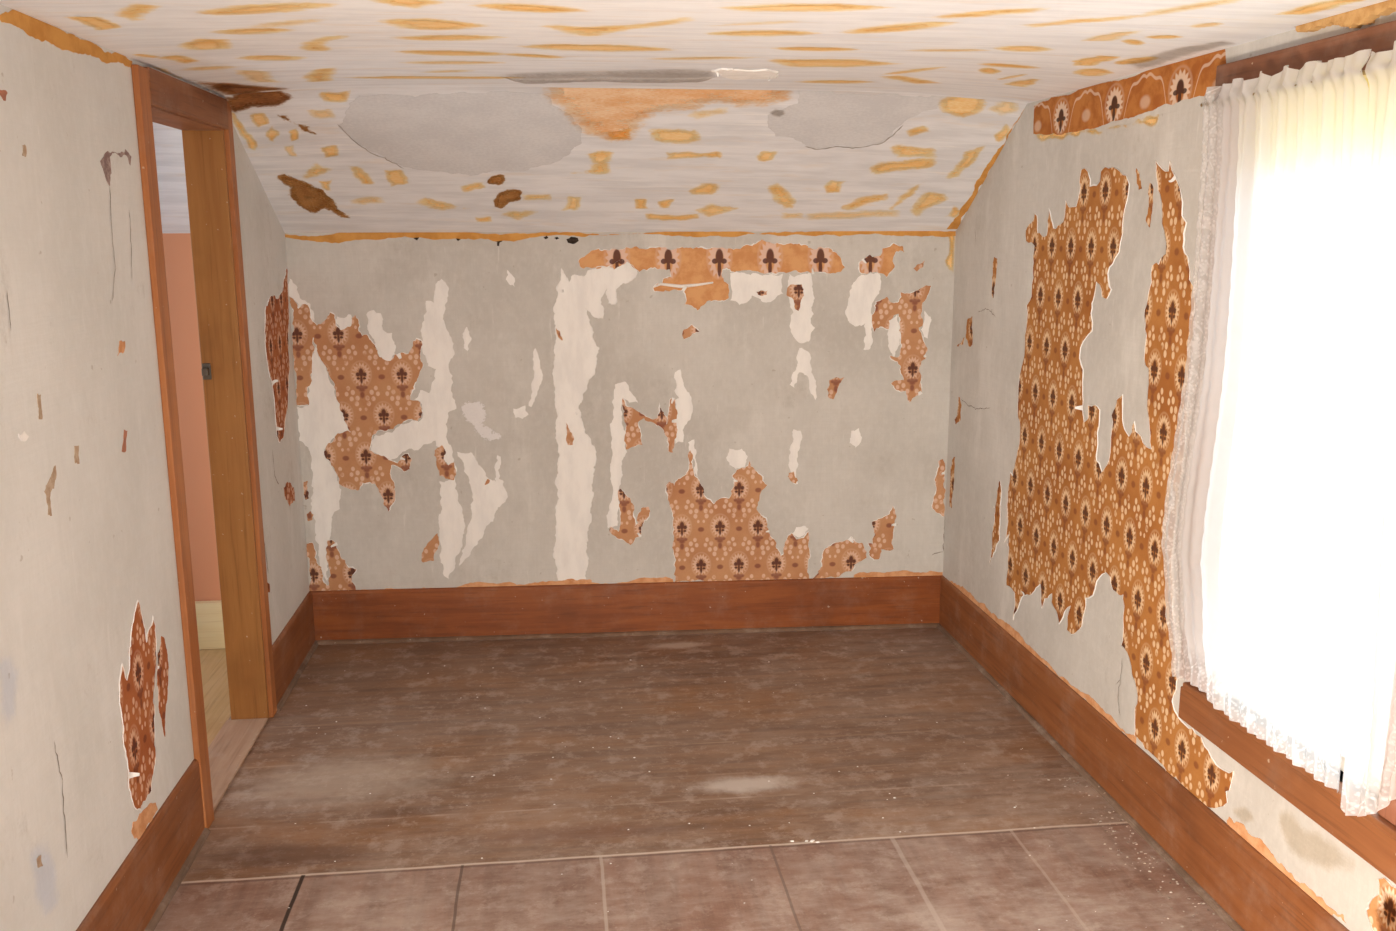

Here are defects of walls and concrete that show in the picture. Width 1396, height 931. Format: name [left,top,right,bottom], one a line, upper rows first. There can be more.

peeling [636,110,1024,267]
peeling [285,232,618,243]
peeling [787,269,814,311]
peeling [682,324,700,339]
peeling [827,377,844,399]
peeling [284,481,313,521]
peeling [459,577,673,587]